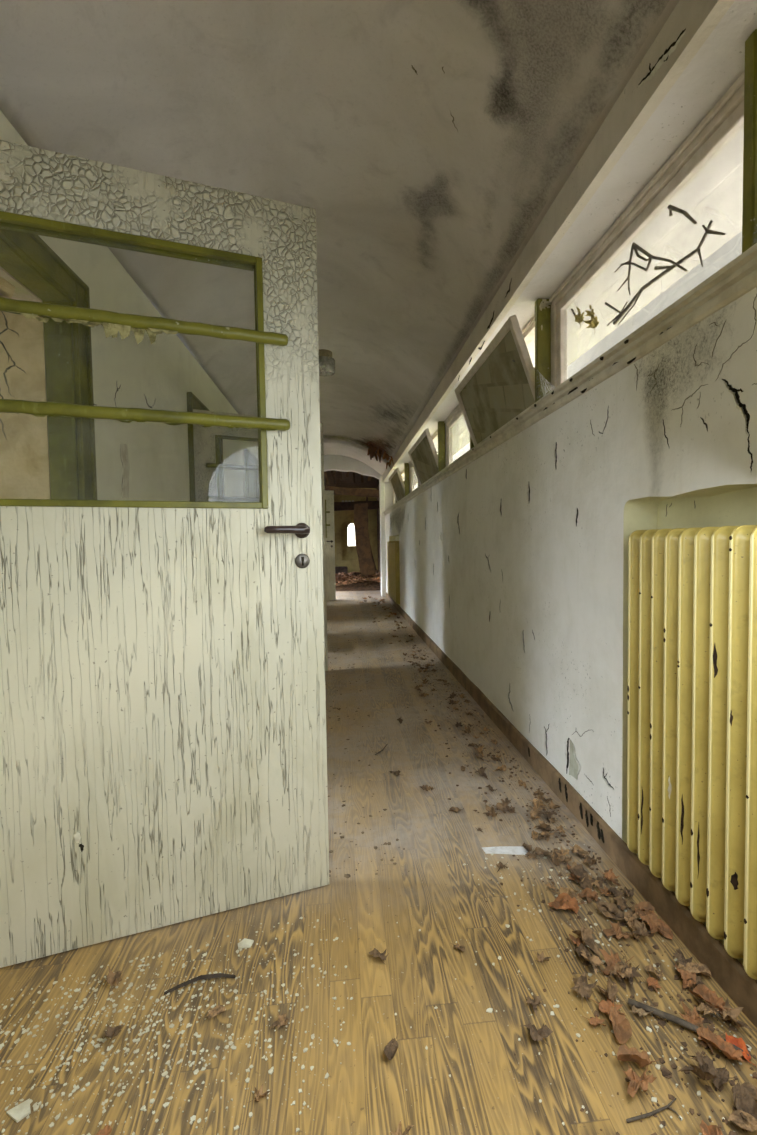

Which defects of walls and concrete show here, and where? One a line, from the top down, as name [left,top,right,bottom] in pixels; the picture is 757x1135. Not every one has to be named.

crack [634,364,659,392]
crack [663,294,757,471]